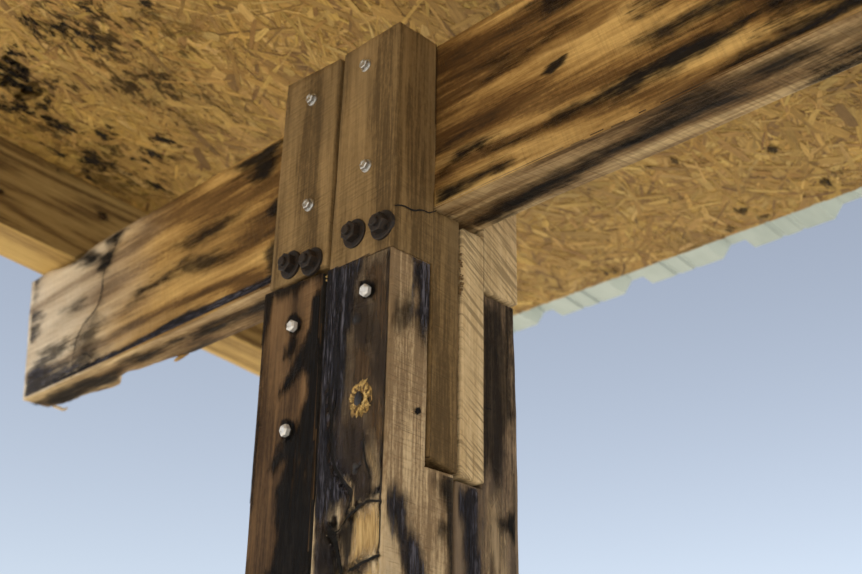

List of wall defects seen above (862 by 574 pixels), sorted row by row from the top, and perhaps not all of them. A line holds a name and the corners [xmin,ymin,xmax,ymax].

damp [0,0,200,193]
crack [395,205,437,213]
crack [71,240,118,377]
crack [326,293,381,574]